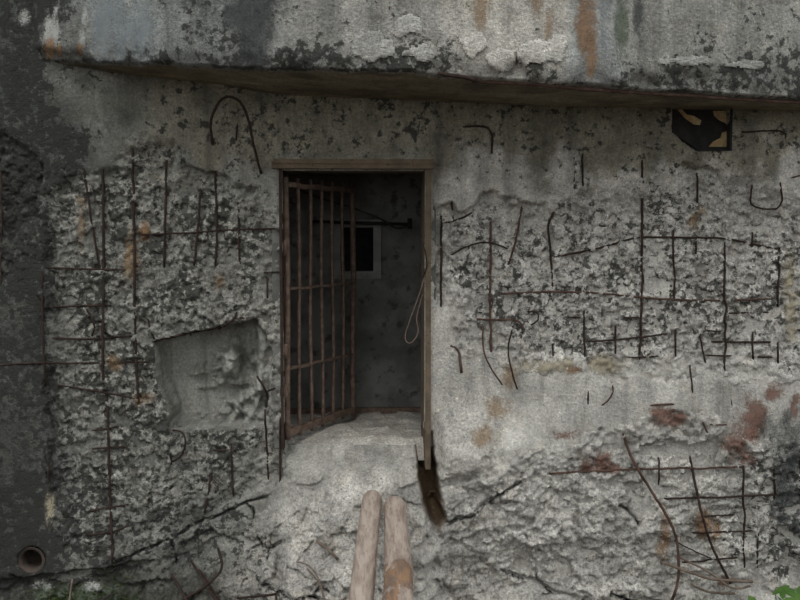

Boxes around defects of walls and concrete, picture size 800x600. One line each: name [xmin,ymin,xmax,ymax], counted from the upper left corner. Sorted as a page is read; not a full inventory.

water stain [42,7,60,51]
water stain [224,0,282,72]
flaking render [350,14,434,63]
flaking render [437,32,800,105]
spalling [209,95,262,174]
peeling [678,109,701,125]
peeling [709,111,727,147]
spalling [431,153,800,406]
spalling [0,126,295,600]
crack [447,481,522,526]
spalling [413,403,800,600]